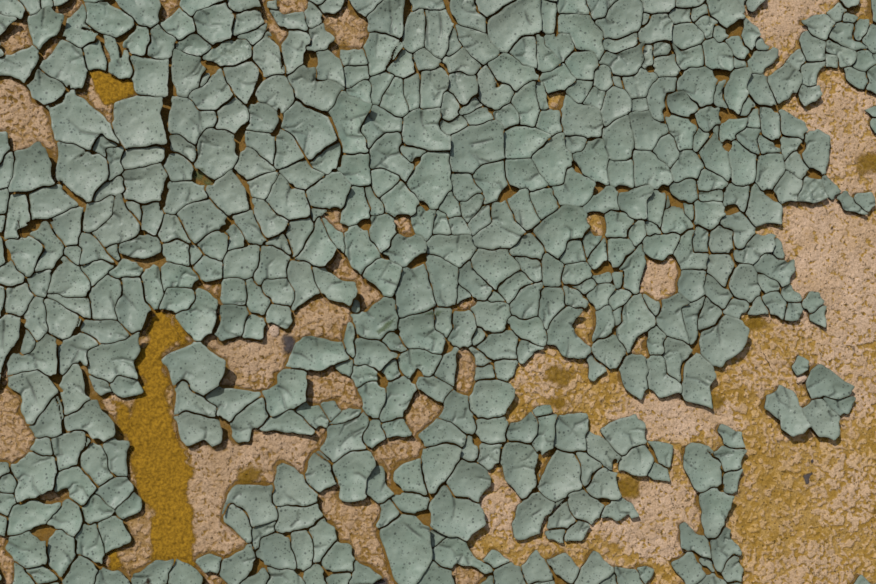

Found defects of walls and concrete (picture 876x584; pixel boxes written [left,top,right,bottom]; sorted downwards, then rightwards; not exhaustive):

peeling [0,0,68,83]
peeling [27,4,107,105]
peeling [785,0,876,106]
peeling [0,283,143,470]
peeling [0,56,207,333]
peeling [78,0,841,513]
peeling [429,66,876,584]
peeling [0,438,203,584]
peeling [162,342,326,562]
peeling [195,463,382,584]
peeling [319,484,399,584]
peeling [379,514,433,584]